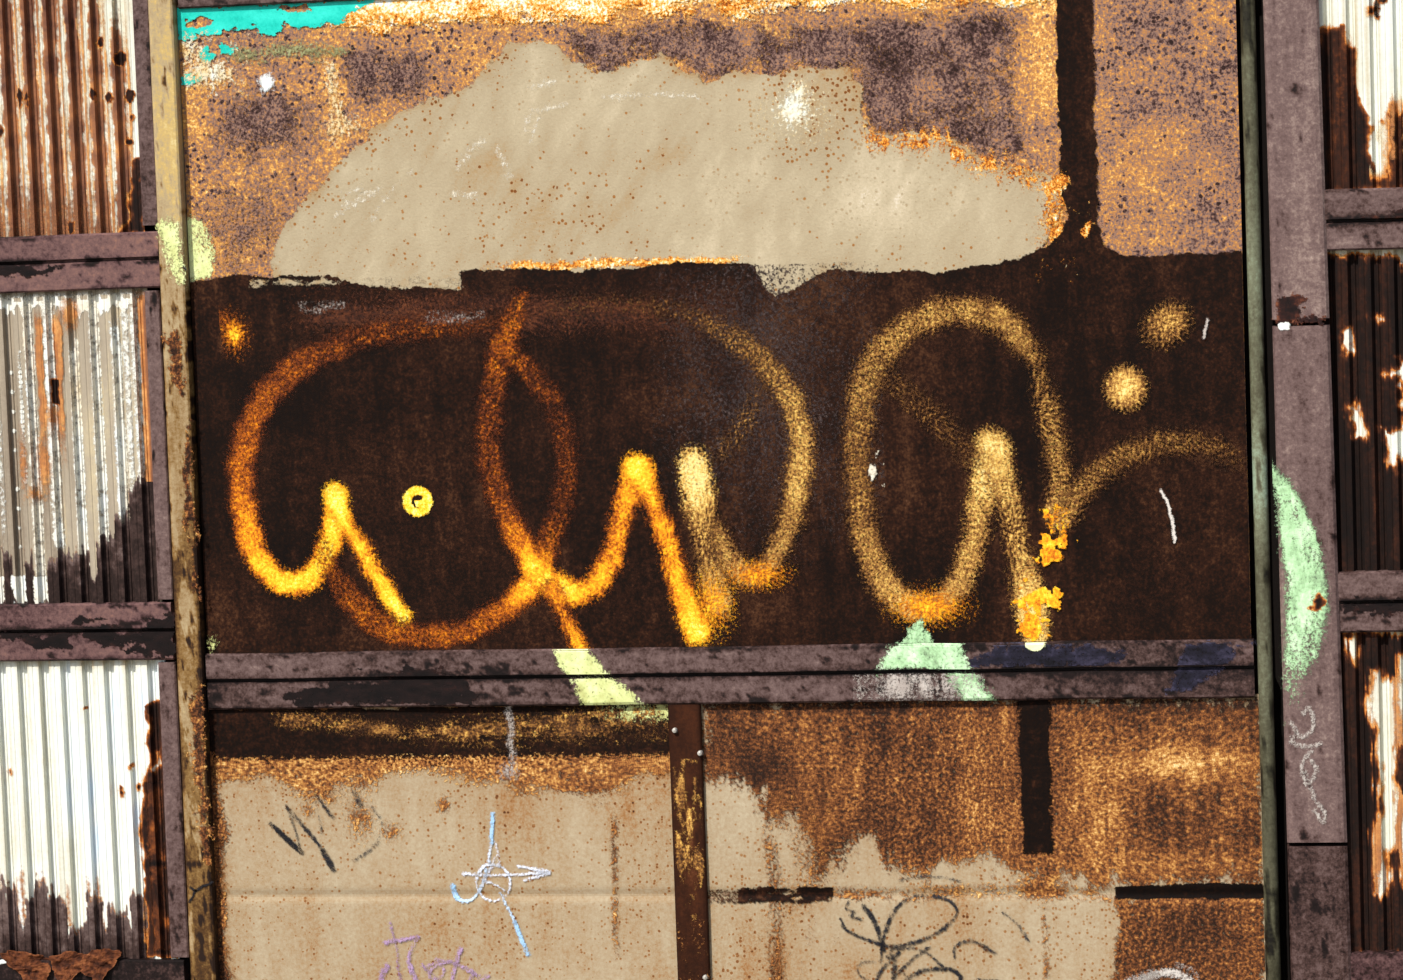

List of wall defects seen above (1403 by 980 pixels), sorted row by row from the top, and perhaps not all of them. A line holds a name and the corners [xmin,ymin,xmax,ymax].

rust [0,0,134,237]
rust [186,0,1071,275]
peeling [1320,24,1403,189]
spalling [1366,0,1388,20]
peeling [0,262,177,659]
peeling [1275,251,1403,571]
rust [0,948,122,980]
peeling [0,872,154,964]
spalling [119,763,141,797]
rust [144,779,171,951]
rust [702,697,1265,980]
peeling [1335,596,1403,951]